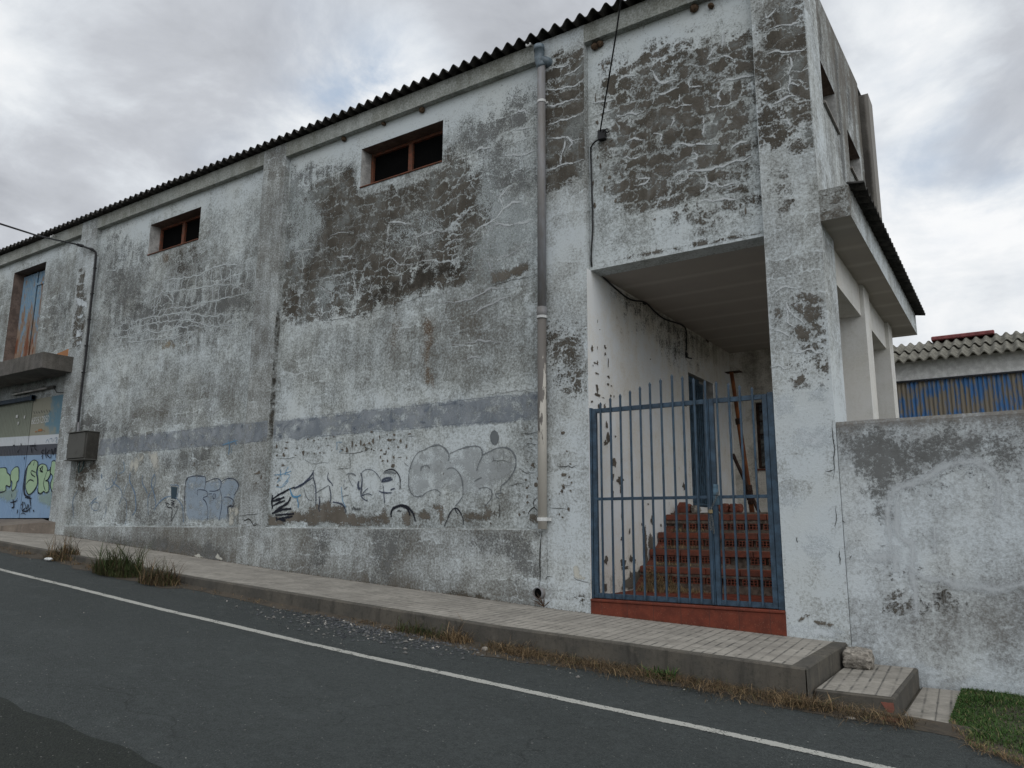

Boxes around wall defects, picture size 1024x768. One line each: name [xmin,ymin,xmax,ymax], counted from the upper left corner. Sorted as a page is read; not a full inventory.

water stain [269,0,814,437]
water stain [770,289,829,389]
water stain [839,420,1023,524]